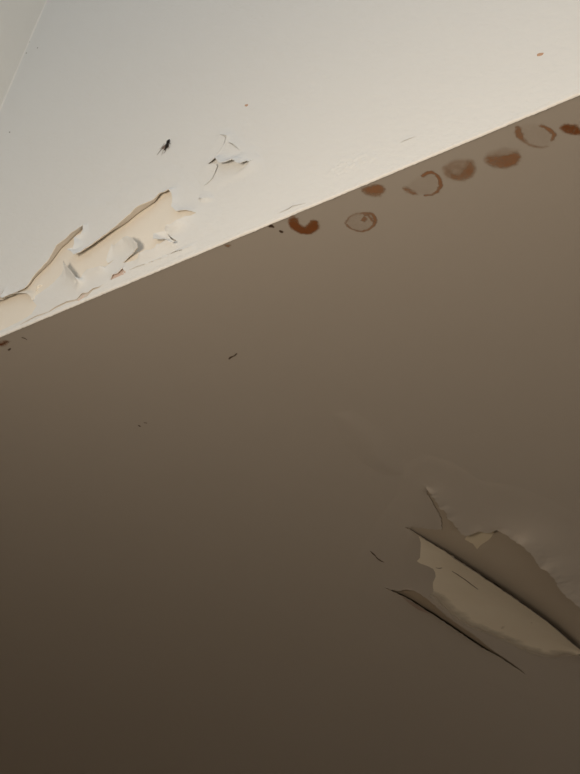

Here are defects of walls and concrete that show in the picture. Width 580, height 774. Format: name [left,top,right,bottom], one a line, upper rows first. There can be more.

rust [540,125,580,141]
rust [486,153,520,168]
rust [403,162,475,196]
rust [363,185,385,196]
peeling [0,126,266,333]
rust [289,217,319,234]
rust [346,212,377,232]
peeling [341,453,580,717]